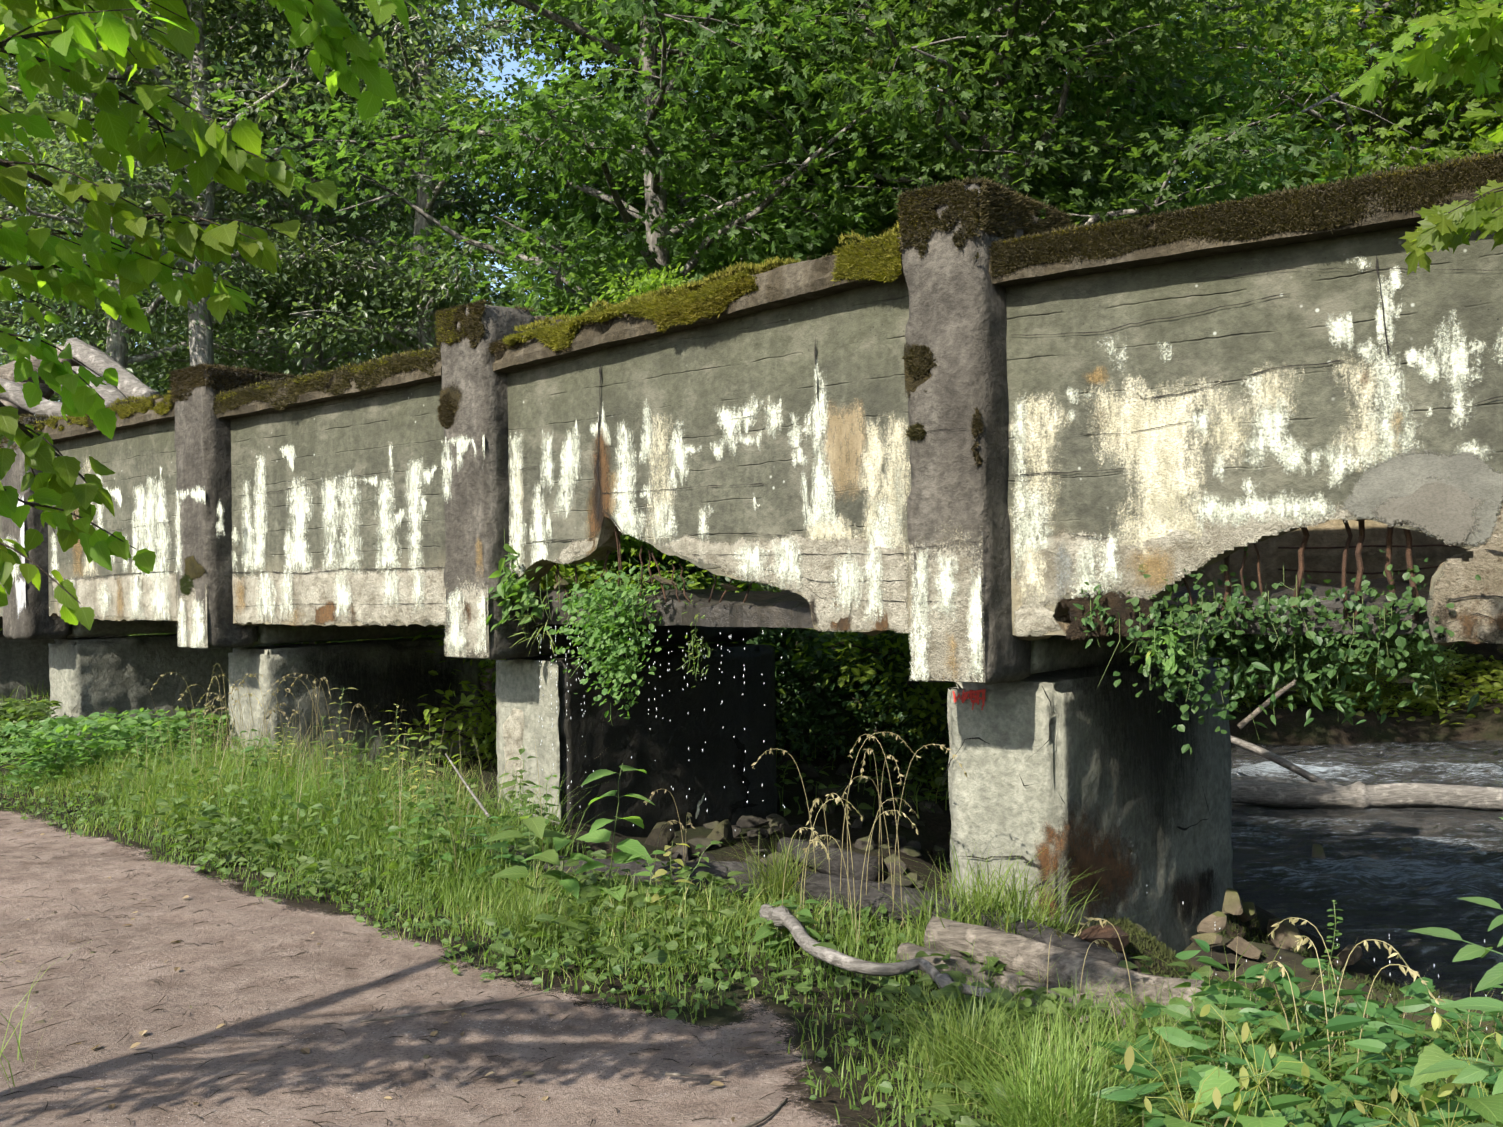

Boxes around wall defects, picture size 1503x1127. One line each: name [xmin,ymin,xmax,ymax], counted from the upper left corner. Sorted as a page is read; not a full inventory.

efflorescence [51,531,59,578]
efflorescence [83,456,267,580]
efflorescence [280,435,485,573]
spalling [554,537,599,565]
efflorescence [507,364,911,574]
spalling [1014,505,1355,641]
efflorescence [1010,267,1503,573]
corrosion [1036,804,1138,926]